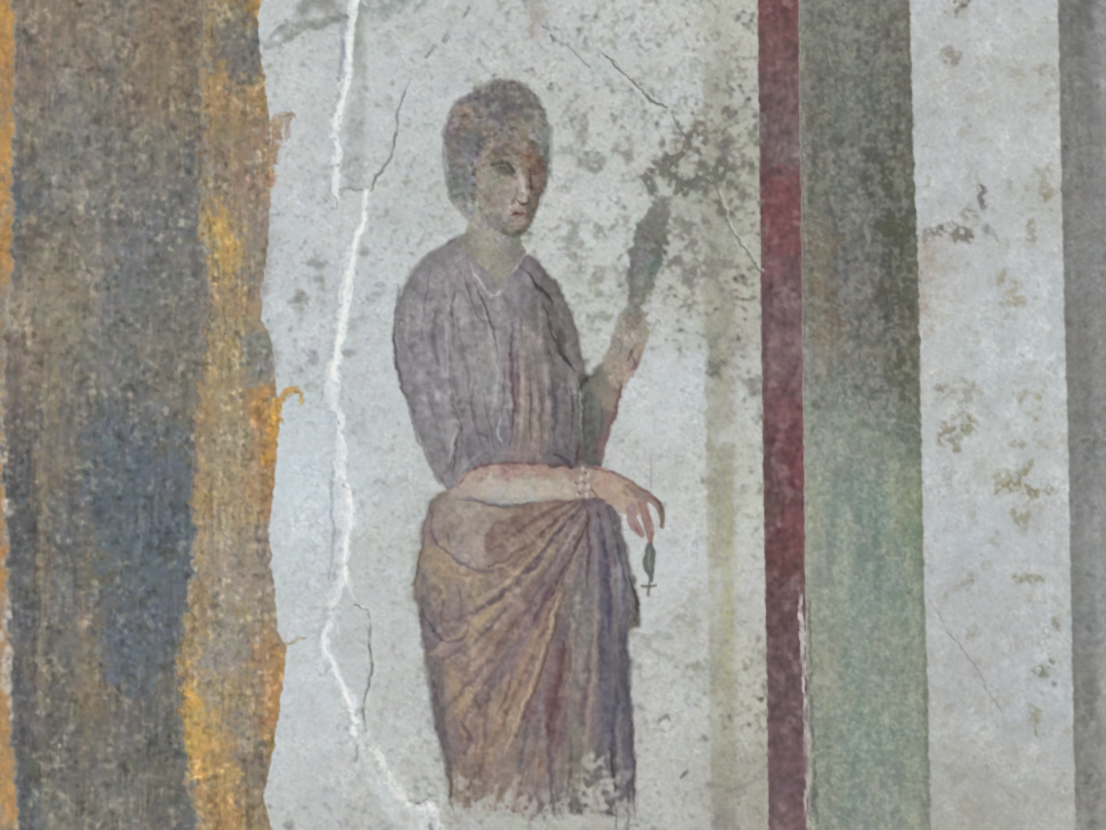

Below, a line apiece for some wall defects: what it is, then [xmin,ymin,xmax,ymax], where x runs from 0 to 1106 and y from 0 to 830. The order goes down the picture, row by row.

crack [552,39,688,140]
crack [700,165,762,273]
crack [319,0,449,830]